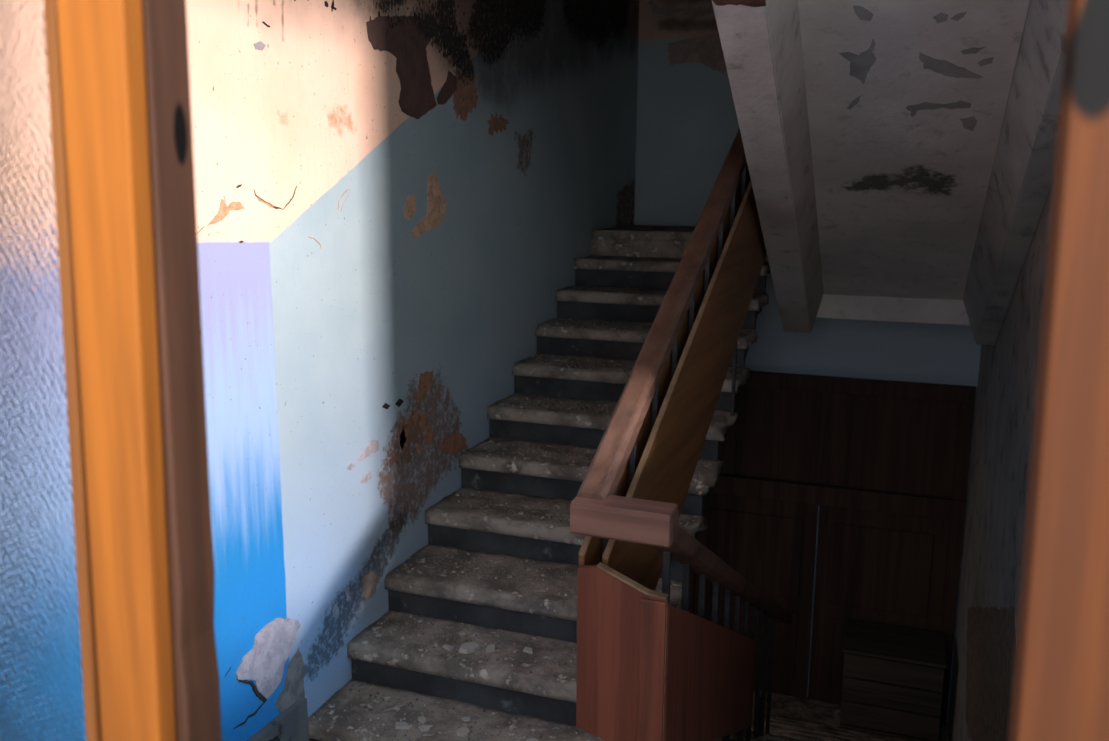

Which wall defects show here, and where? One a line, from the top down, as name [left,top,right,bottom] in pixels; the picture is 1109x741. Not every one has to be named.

peeling [366,15,478,121]
peeling [197,199,245,233]
peeling [403,173,447,239]
peeling [235,618,305,714]